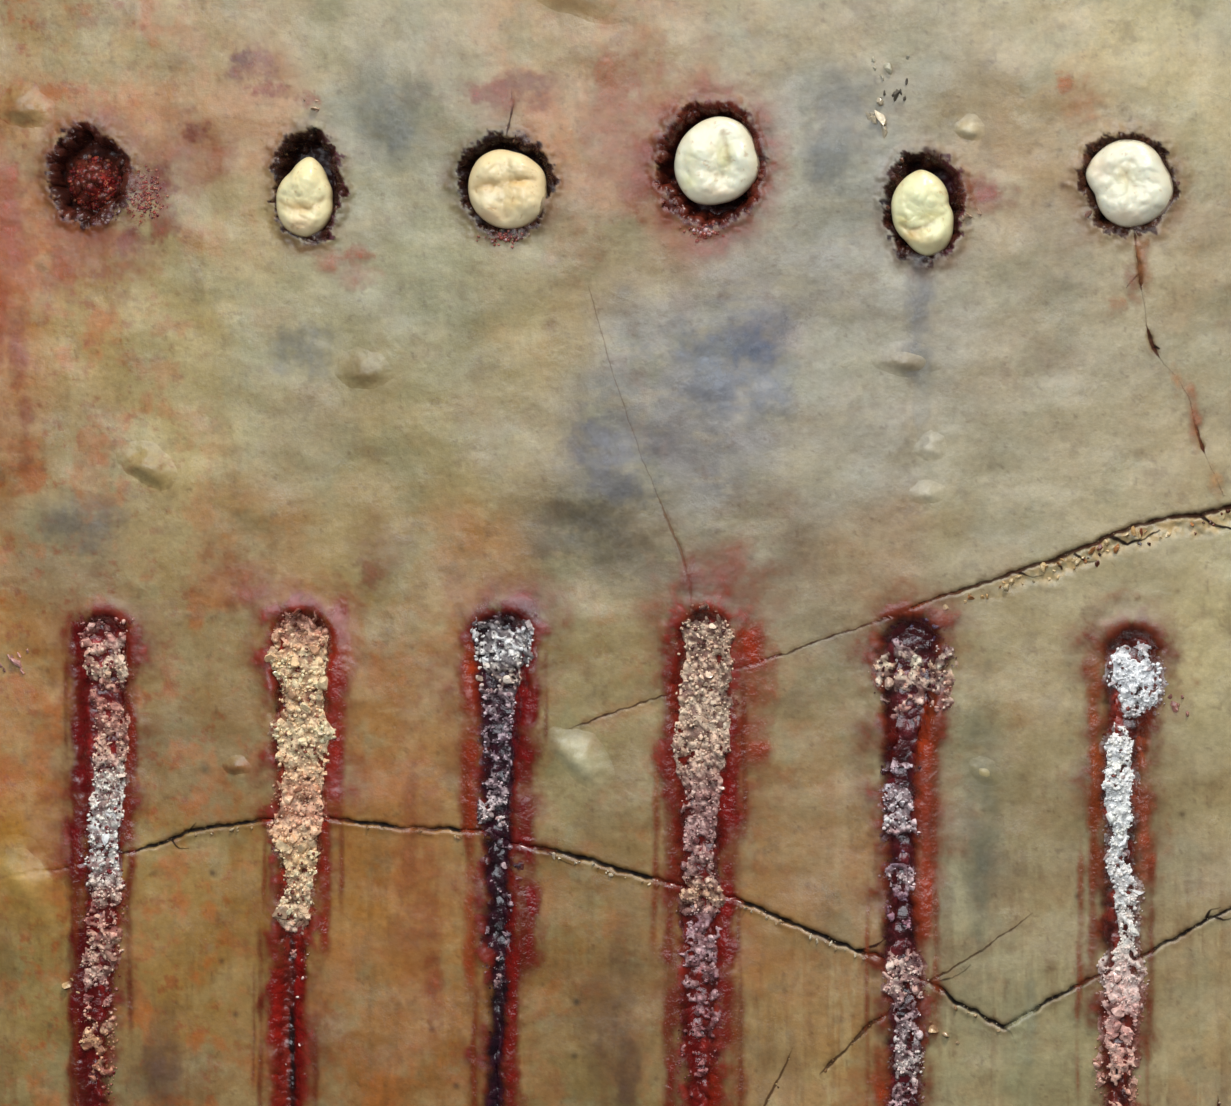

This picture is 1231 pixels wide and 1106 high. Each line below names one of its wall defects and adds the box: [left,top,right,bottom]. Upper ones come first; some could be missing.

spalling [45,122,133,230]
rust [642,83,776,244]
crack [915,326,1231,610]
rust [59,603,150,1106]
crack [121,818,268,854]
rust [250,591,357,948]
rust [449,589,551,1106]
crack [530,845,680,887]
rust [652,593,769,1106]
crack [734,895,883,961]
crack [920,926,1100,1033]
rust [1072,616,1179,950]